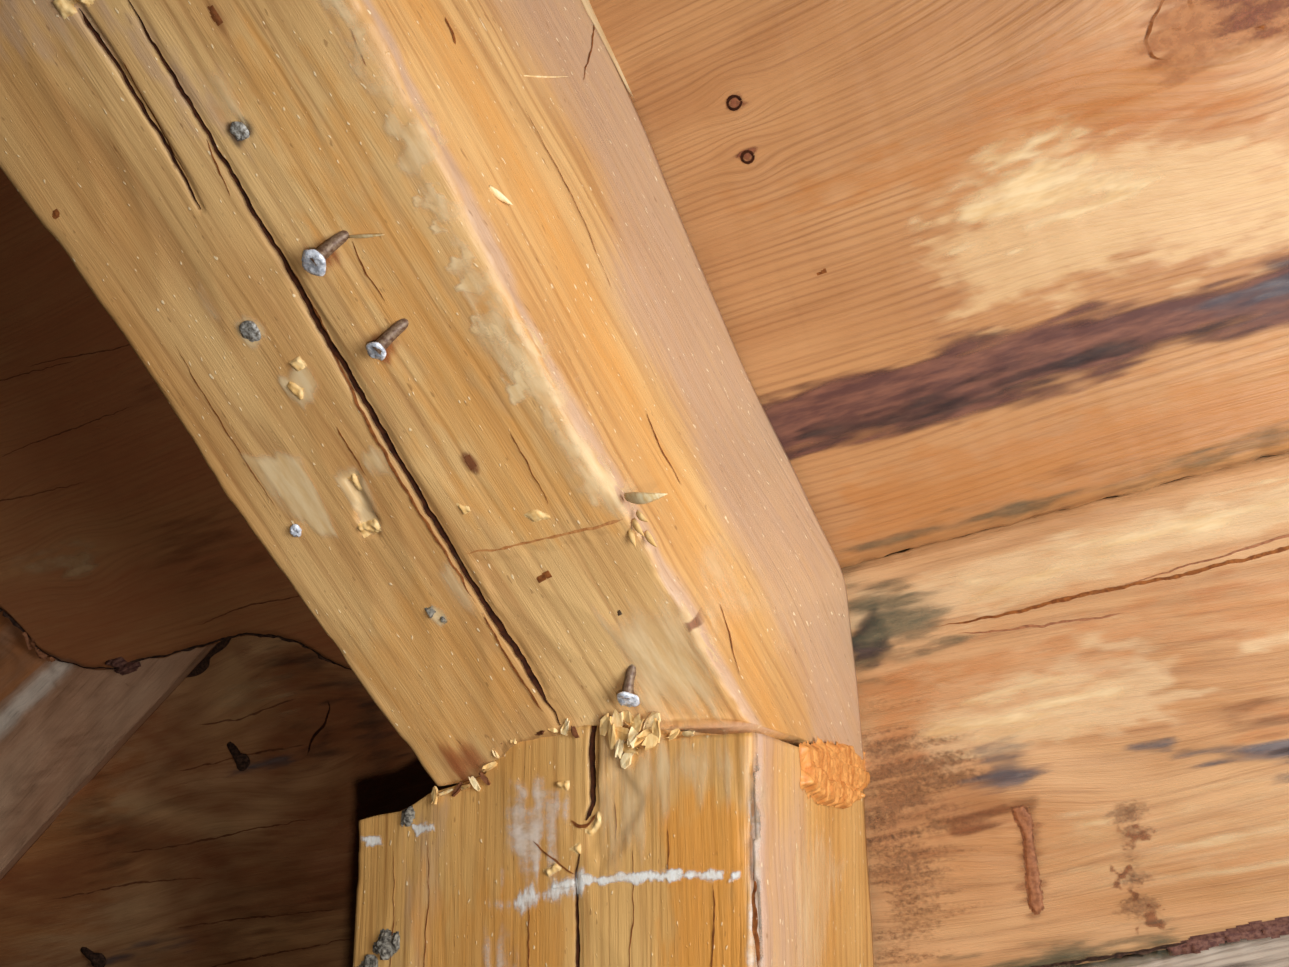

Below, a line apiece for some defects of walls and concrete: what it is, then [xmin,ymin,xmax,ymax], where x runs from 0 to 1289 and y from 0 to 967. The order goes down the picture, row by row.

crack [584,25,595,78]
crack [79,1,561,725]
damp [762,257,1289,460]
crack [647,414,680,482]
crack [932,534,1289,634]
damp [849,585,942,664]
damp [977,769,1037,785]
damp [1237,740,1289,758]
crack [533,726,634,967]
damp [951,807,1009,834]
crack [422,838,430,967]
crack [524,906,532,967]